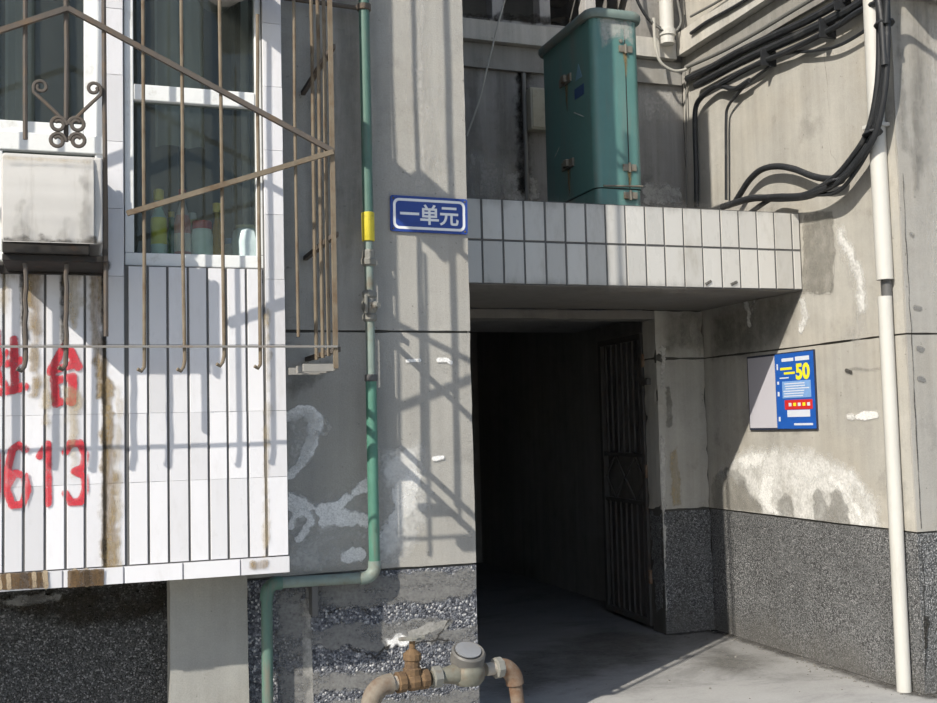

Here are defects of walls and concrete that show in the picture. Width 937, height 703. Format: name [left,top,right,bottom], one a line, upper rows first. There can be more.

corrosion [91,276,119,568]
efflorescence [287,405,324,480]
efflorescence [288,479,368,569]
efflorescence [380,447,425,560]
efflorescence [727,448,879,527]